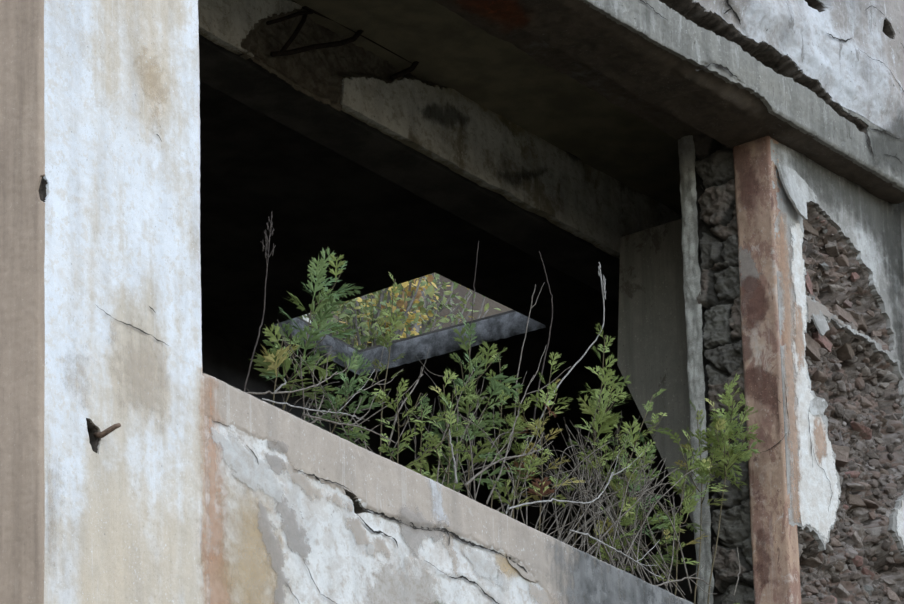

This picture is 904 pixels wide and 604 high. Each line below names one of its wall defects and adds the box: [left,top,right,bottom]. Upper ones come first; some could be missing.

crack [724,0,741,25]
crack [696,63,737,77]
crack [827,33,904,92]
crack [95,304,169,346]
rust [777,216,805,523]
spalling [789,204,904,604]
rust [814,420,827,462]
peeling [211,427,311,604]
crack [294,469,527,572]
crack [426,561,499,604]